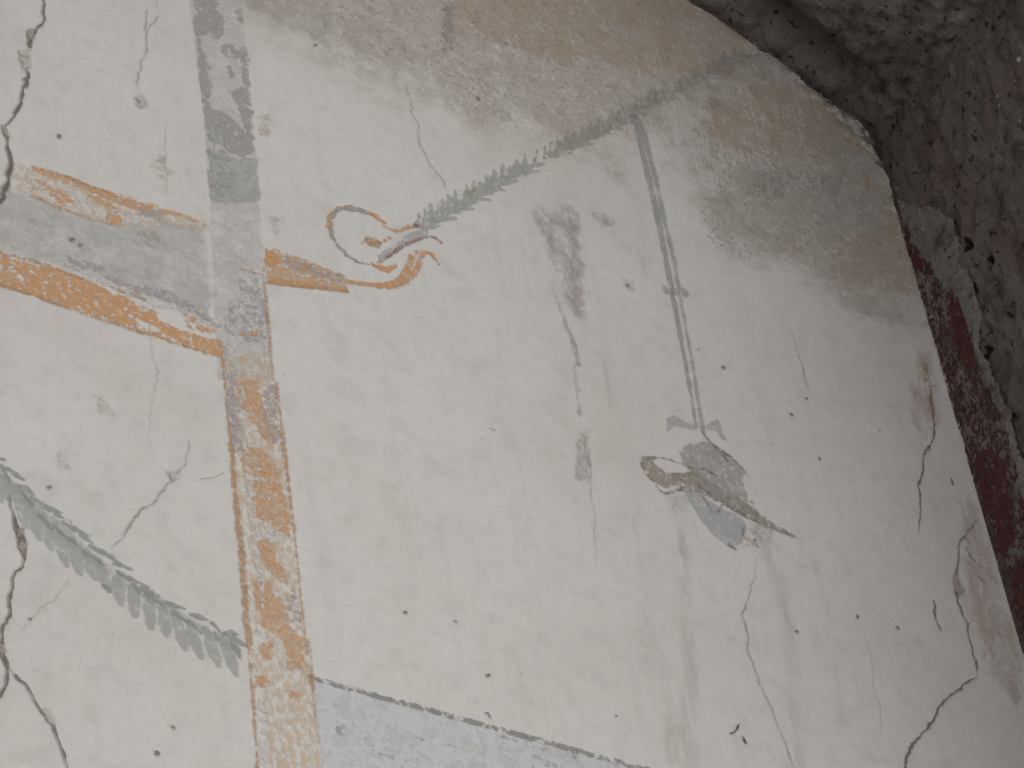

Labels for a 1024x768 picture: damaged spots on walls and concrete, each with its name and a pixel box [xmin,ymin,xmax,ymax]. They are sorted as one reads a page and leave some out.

crack [0,0,46,204]
leakage [251,0,914,318]
flaking render [795,79,884,168]
crack [113,442,223,547]
crack [917,363,936,530]
crack [0,494,68,768]
crack [742,562,795,767]
crack [904,518,978,768]